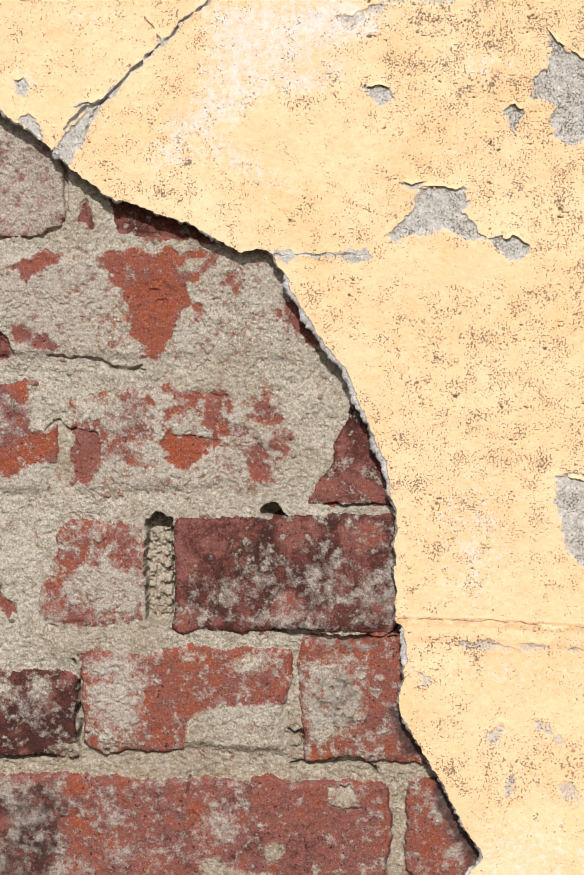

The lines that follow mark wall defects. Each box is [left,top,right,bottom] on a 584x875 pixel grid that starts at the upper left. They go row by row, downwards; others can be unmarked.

peeling [13,75,29,97]
crack [63,0,211,136]
peeling [363,80,394,107]
peeling [503,27,584,146]
peeling [388,178,530,261]
spalling [0,96,483,875]
peeling [553,470,584,567]